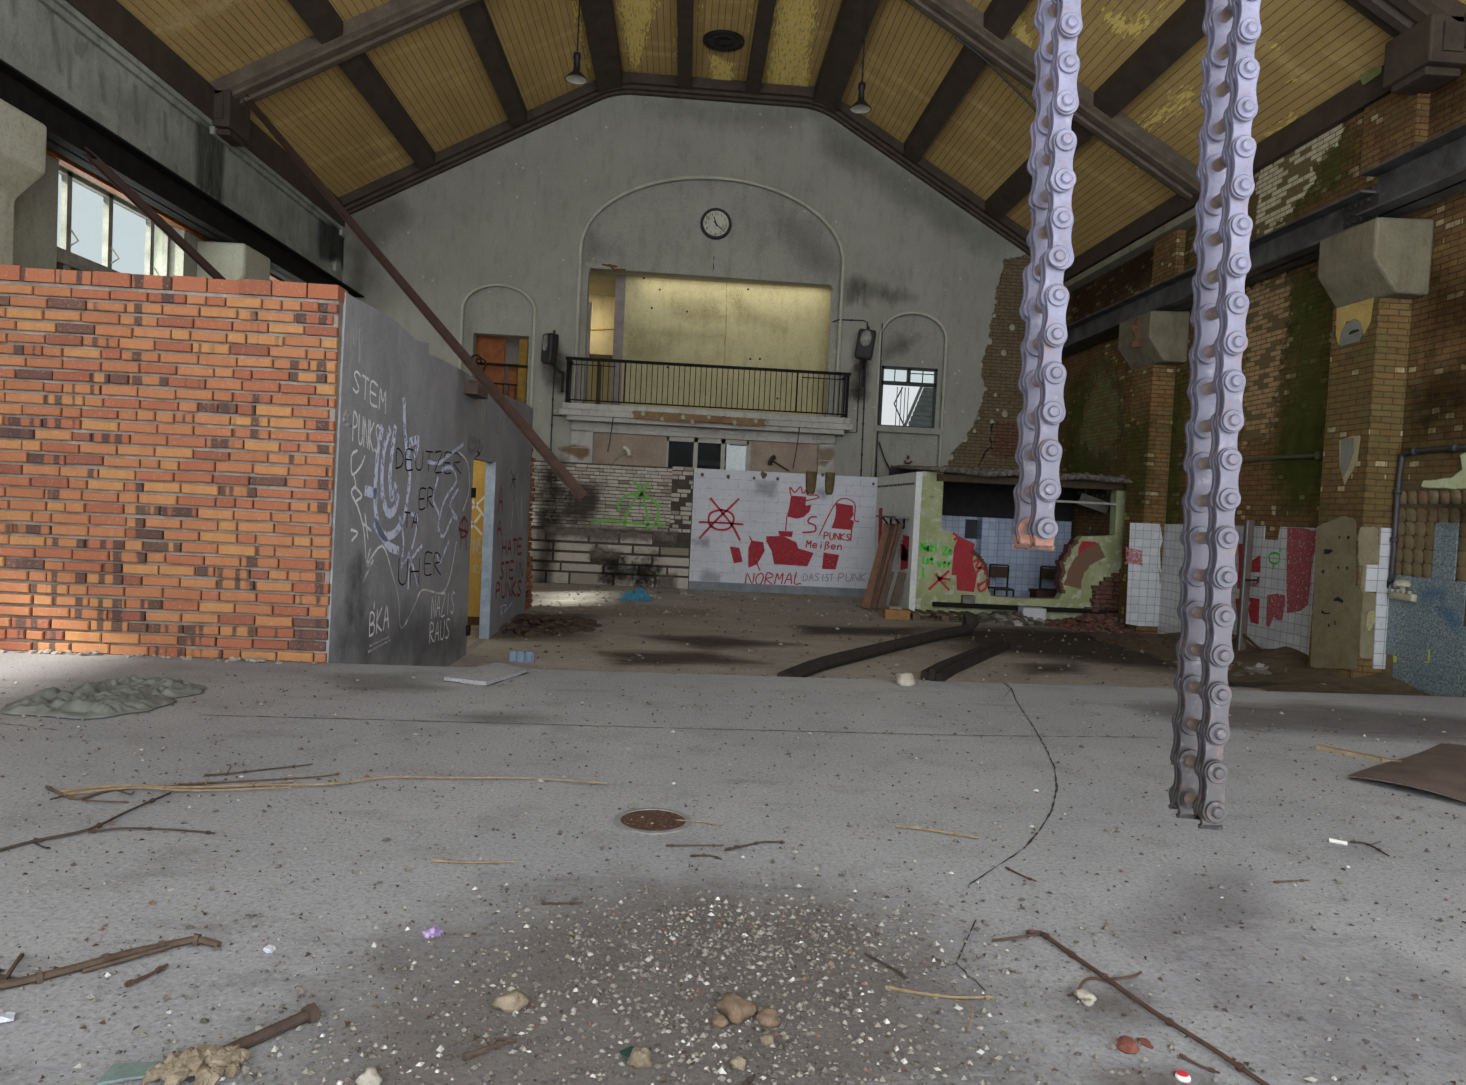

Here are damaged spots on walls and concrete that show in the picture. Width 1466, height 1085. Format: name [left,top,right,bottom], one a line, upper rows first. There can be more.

peeling [948,254,1030,471]
spalling [971,550,990,586]
spalling [1054,540,1078,594]
flaking render [1084,569,1121,617]
crack [969,682,1058,885]
crack [929,920,986,991]